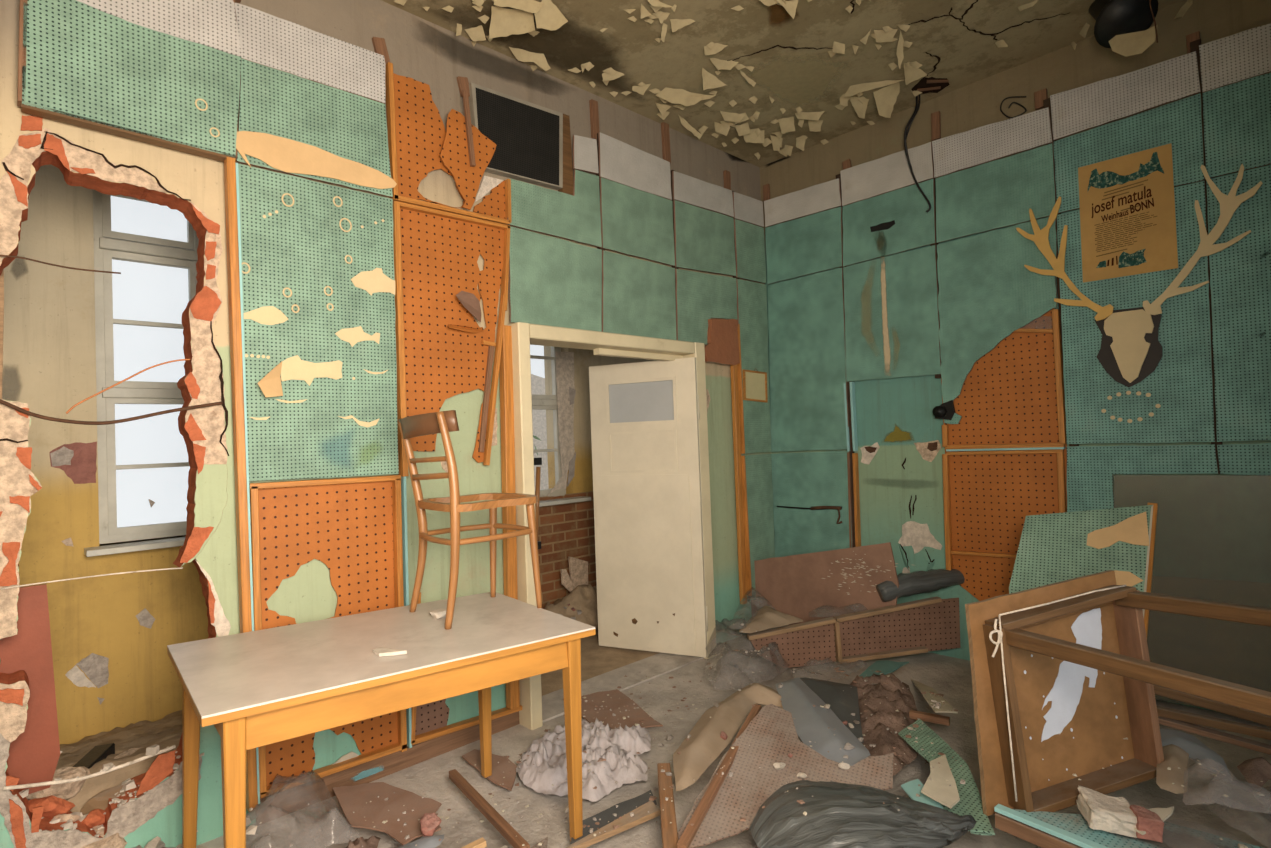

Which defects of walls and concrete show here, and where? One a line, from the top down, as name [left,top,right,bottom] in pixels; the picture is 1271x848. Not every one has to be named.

peeling [422,0,568,71]
peeling [568,24,950,169]
peeling [759,0,812,19]
crack [925,52,941,76]
crack [908,0,1069,40]
spalling [0,115,167,264]
crack [0,436,28,444]
spalling [184,201,227,508]
crack [210,321,229,456]
spalling [0,400,42,639]
flaking render [179,488,231,637]
spalling [0,680,182,848]